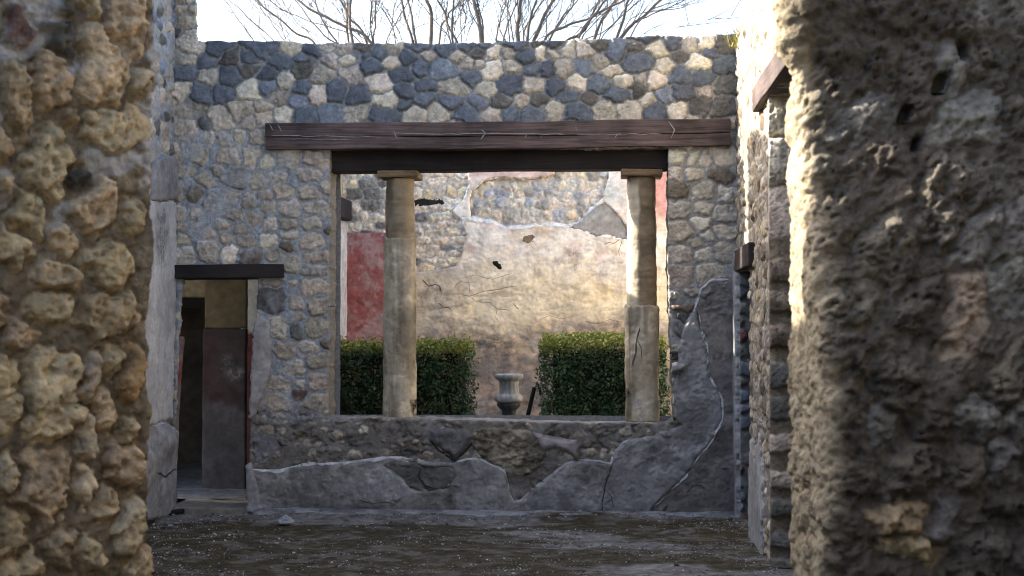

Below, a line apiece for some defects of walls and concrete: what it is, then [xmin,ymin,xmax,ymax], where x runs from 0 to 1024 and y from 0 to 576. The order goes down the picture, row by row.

peeling [342,174,387,233]
peeling [414,172,627,272]
crack [418,274,642,368]